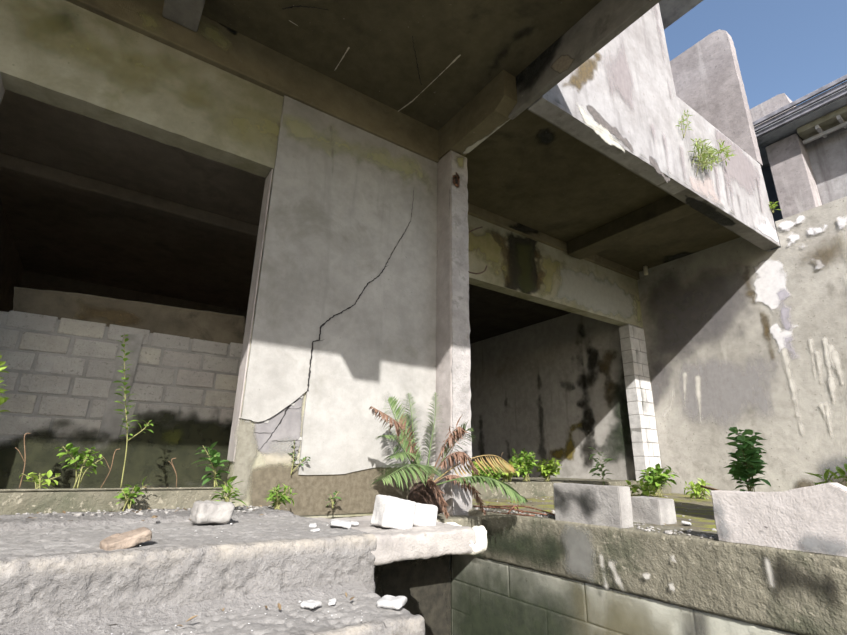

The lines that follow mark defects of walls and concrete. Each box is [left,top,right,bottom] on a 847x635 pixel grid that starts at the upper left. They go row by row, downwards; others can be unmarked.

spalling [579,105,633,152]
crack [307,190,414,391]
leakage [491,223,545,294]
leakage [558,267,755,353]
leakage [761,313,770,340]
spalling [754,259,798,401]
spalling [245,395,303,464]
leakage [562,347,634,466]
leakage [641,362,768,421]
leakage [474,526,621,585]
leakage [766,557,838,603]
leakage [603,603,655,635]